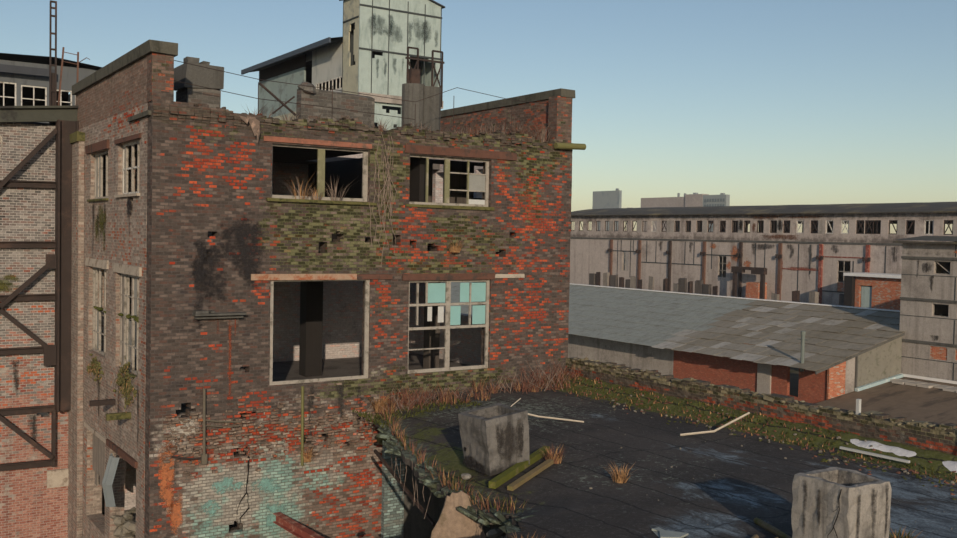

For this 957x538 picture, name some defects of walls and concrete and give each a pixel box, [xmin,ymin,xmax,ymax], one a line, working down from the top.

water stain [193,242,226,328]
peeling [202,477,284,526]
spalling [304,456,382,527]
crack [827,489,842,538]